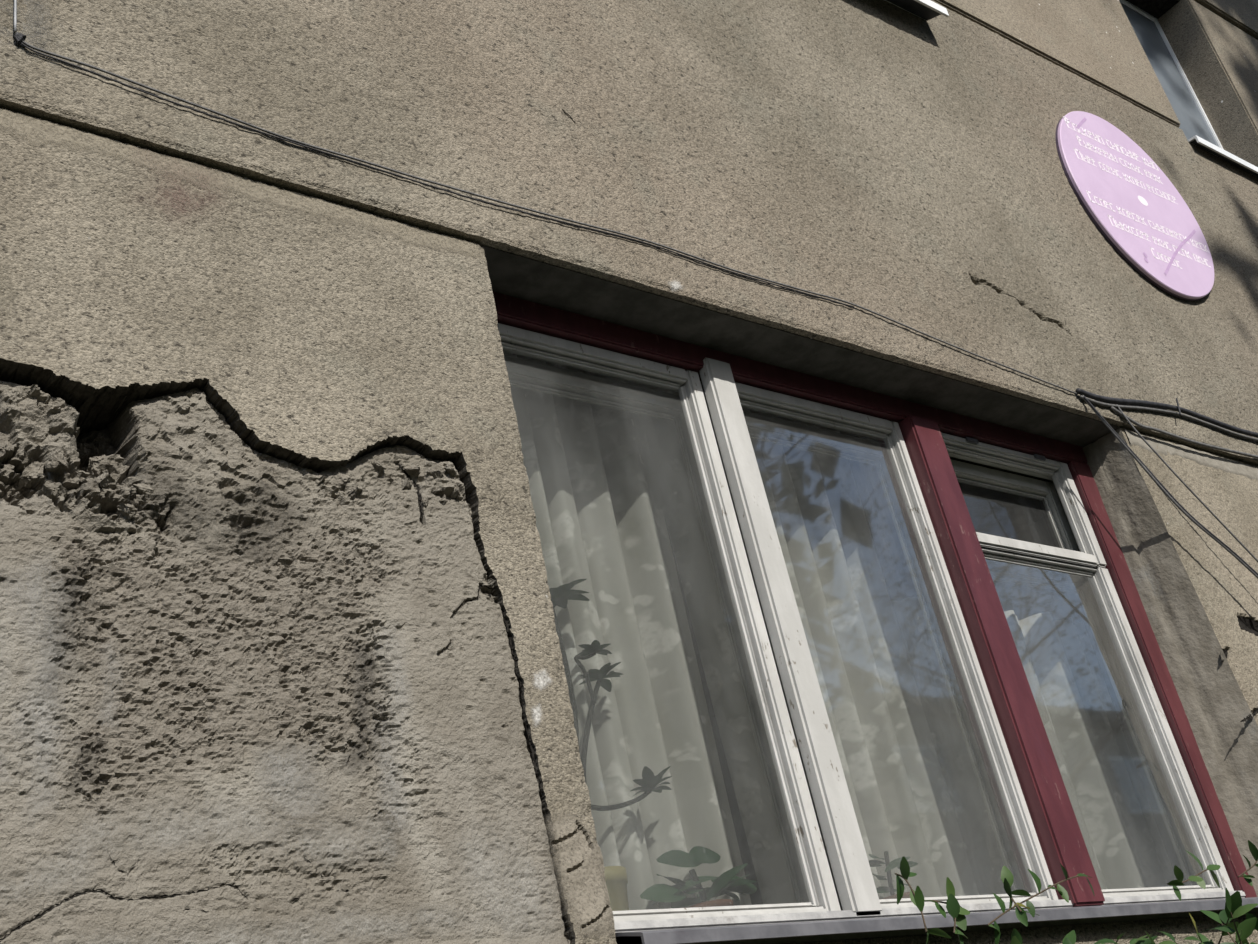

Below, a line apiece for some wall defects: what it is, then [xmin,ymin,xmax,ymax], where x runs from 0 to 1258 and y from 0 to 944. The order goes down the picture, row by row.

crack [397,463,424,524]
spalling [0,381,613,944]
spalling [1237,617,1258,635]
crack [454,584,604,944]
crack [0,851,248,942]